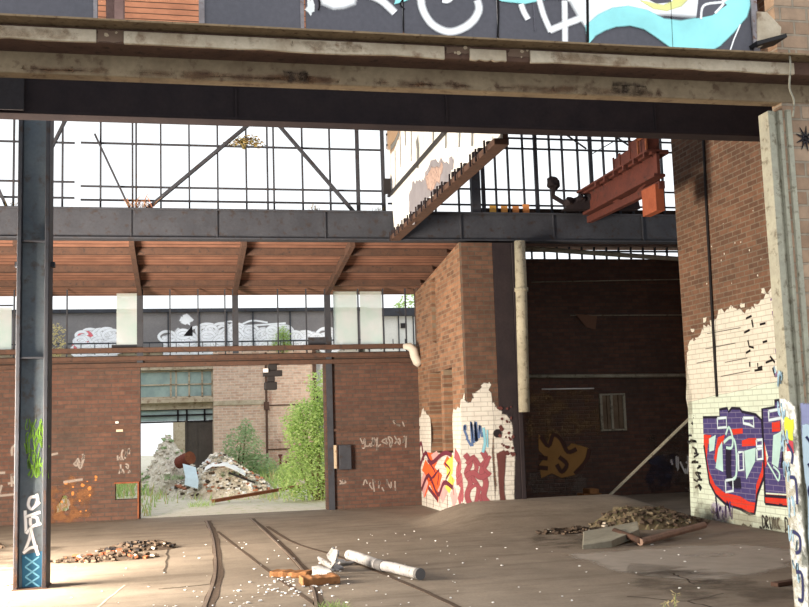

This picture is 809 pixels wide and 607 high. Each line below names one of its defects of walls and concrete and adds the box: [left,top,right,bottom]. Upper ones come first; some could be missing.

peeling [409,147,459,213]
peeling [419,382,515,511]
peeling [657,288,788,533]